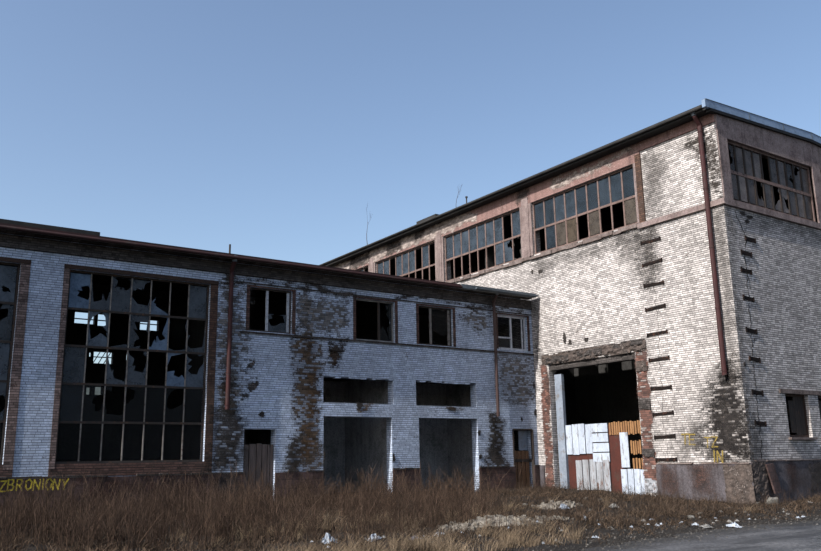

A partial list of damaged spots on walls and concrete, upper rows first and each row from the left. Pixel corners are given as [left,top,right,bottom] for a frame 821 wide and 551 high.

peeling [216,272,357,411]
water stain [695,354,754,463]